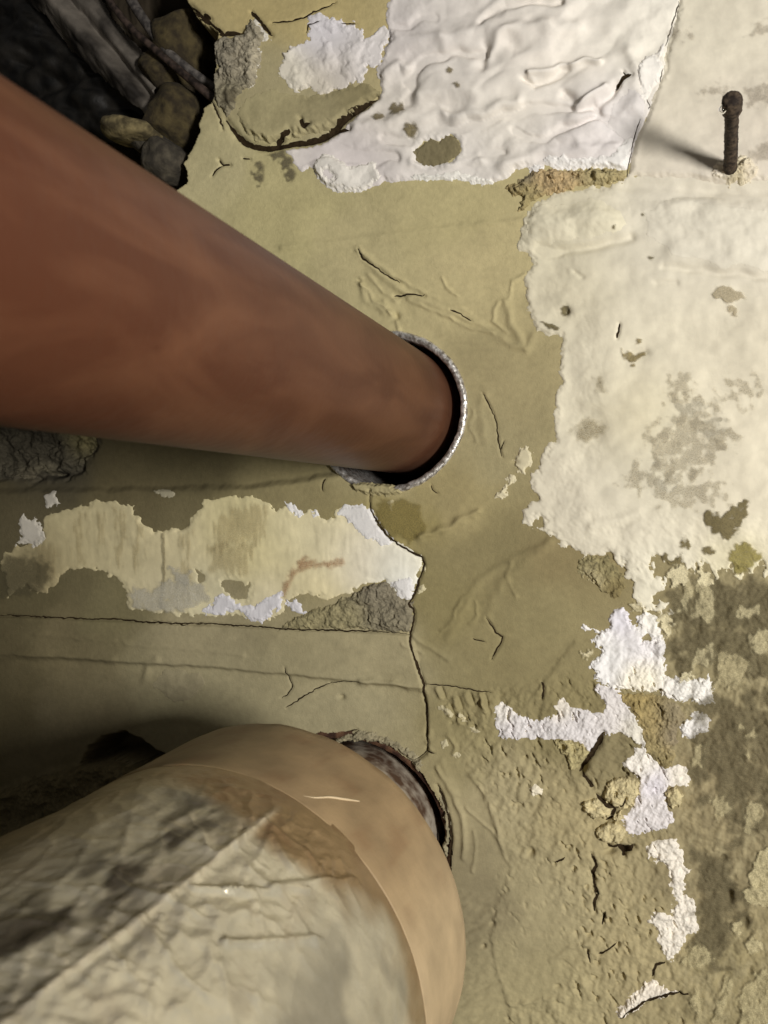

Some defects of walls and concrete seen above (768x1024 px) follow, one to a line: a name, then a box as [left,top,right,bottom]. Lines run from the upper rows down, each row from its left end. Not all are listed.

spalling [213,19,272,117]
peeling [0,489,426,633]
crack [0,490,492,760]
peeling [278,0,768,962]
leakage [632,397,768,678]
crack [438,785,453,863]
leakage [682,691,768,971]
peeling [616,979,677,1018]
leakage [738,968,768,1024]